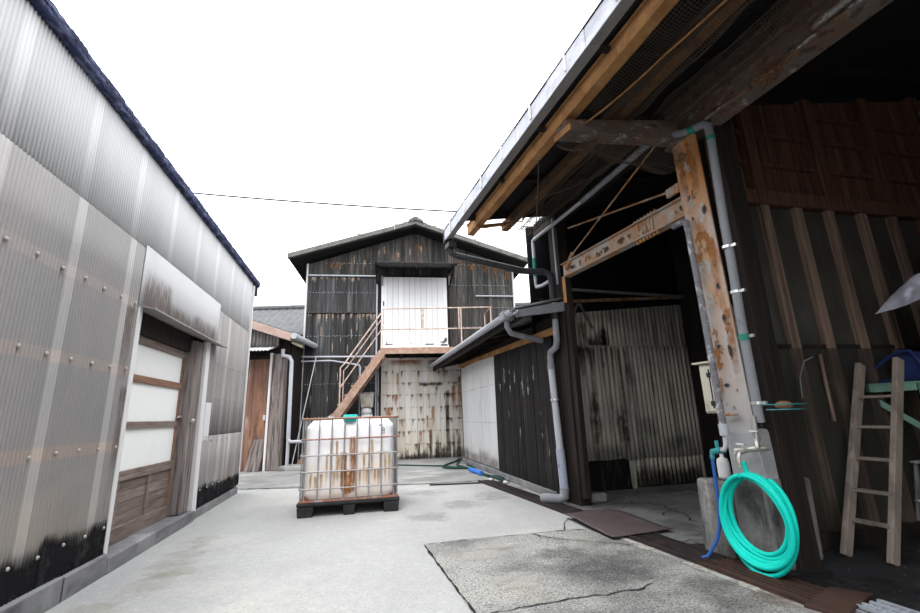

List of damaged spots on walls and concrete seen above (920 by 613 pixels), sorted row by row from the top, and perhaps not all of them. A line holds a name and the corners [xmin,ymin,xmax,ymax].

rust [695,231,716,271]
leakage [578,323,630,392]
rust [713,309,735,392]
rust [384,360,462,447]
leakage [590,393,601,442]
leakage [618,407,629,442]
leakage [0,524,107,607]
crack [424,499,705,613]